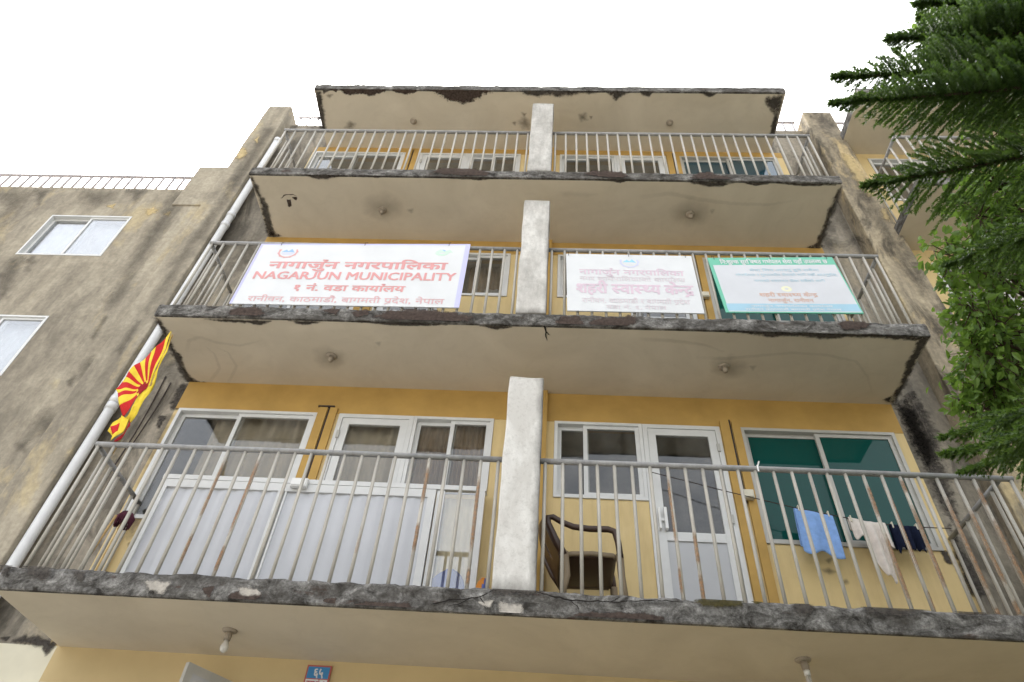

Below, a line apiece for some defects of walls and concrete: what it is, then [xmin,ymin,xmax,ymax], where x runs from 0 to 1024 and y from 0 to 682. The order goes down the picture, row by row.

peeling [331,89,491,105]
peeling [766,95,782,134]
damp [156,318,199,428]
damp [715,330,958,519]
rust [231,465,256,526]
spalling [146,581,169,593]
spalling [228,588,261,600]
crack [432,589,494,606]